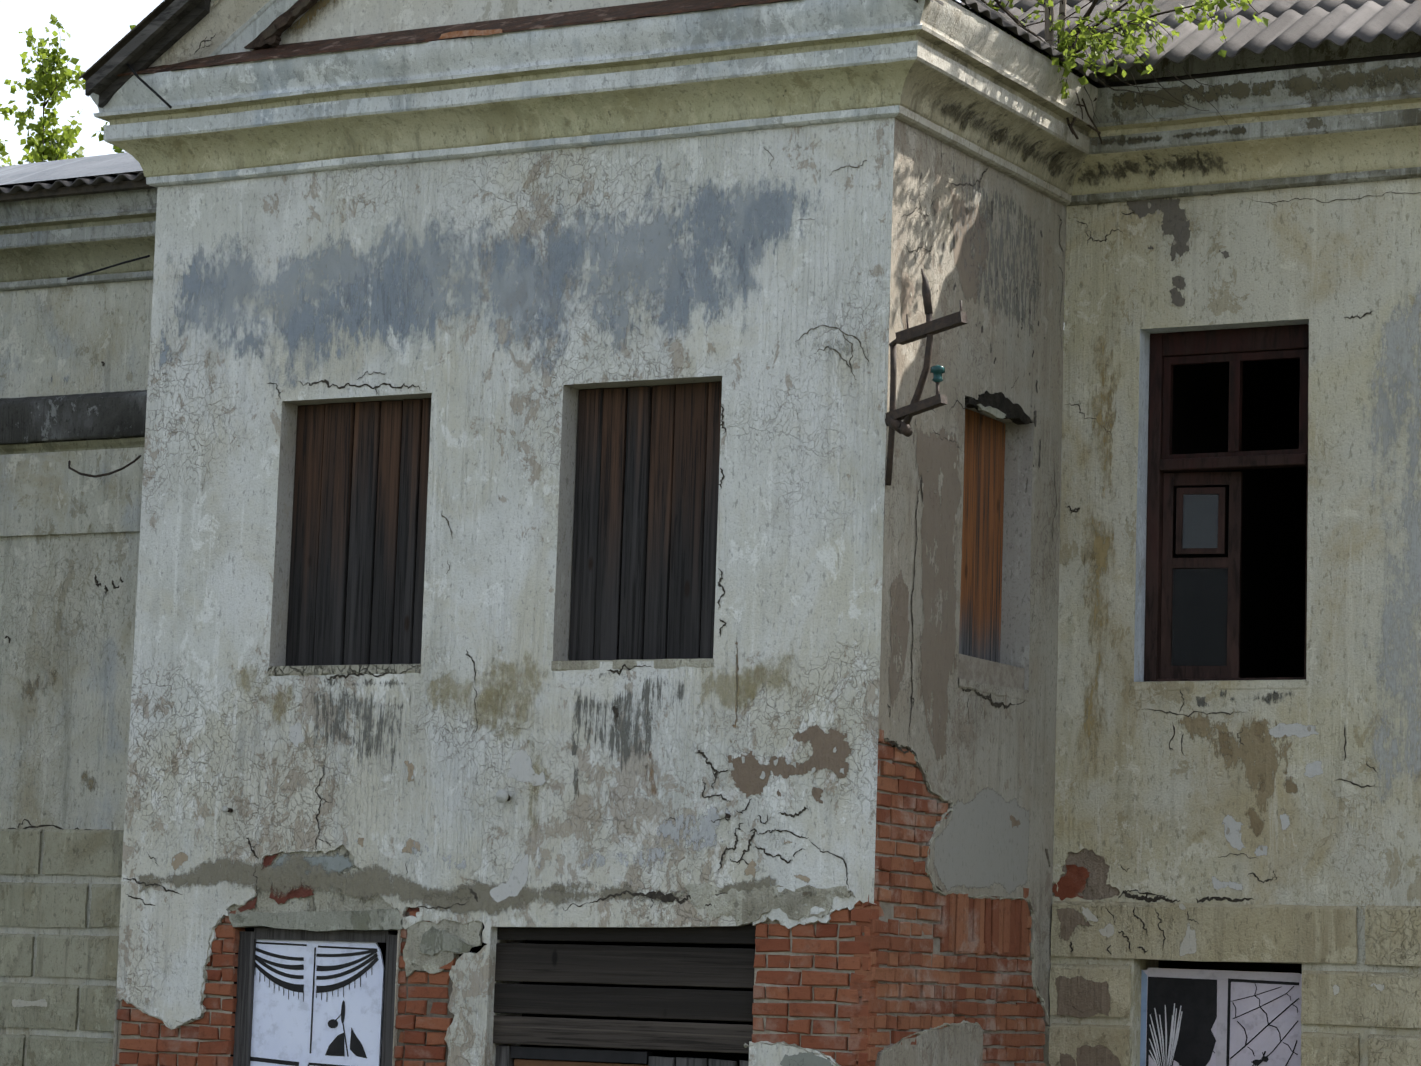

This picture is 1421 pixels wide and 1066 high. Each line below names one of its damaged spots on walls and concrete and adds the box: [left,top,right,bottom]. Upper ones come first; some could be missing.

corrosion [439,29,503,39]
damp [939,103,1246,185]
crack [267,371,427,399]
damp [282,252,435,367]
damp [659,180,808,325]
damp [920,166,1045,493]
peeling [1126,198,1191,308]
damp [571,679,684,796]
flaking render [676,419,1121,1066]
peeling [490,854,540,903]
crack [563,750,849,910]
flaking render [115,837,483,1066]